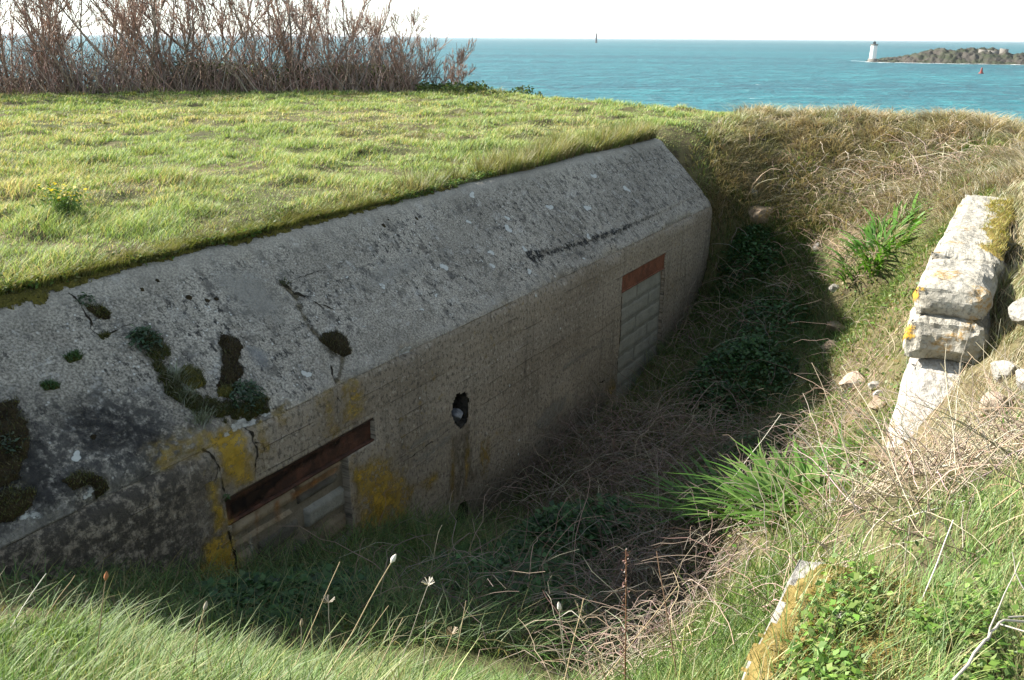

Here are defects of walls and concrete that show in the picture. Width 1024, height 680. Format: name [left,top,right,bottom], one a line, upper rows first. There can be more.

crack [283,262,337,311]
spalling [452,392,468,429]
crack [201,448,225,492]
crack [243,427,265,479]
crack [228,531,238,572]